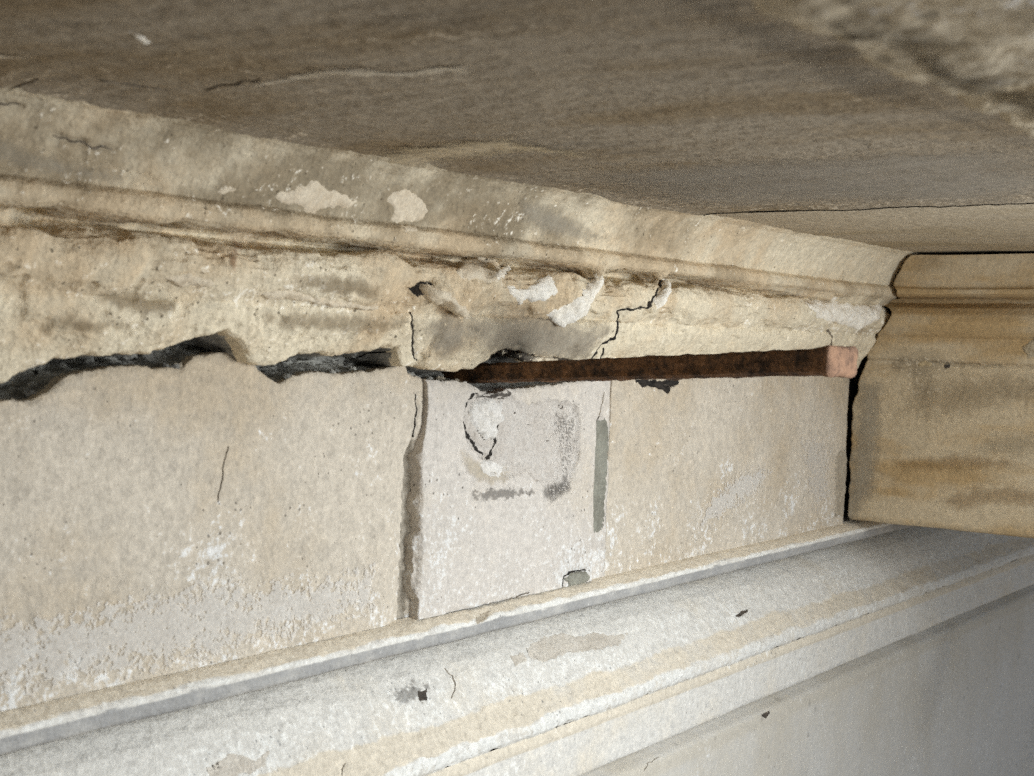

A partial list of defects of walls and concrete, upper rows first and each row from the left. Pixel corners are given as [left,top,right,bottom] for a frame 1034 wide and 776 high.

crack [0,78,38,106]
crack [206,78,261,91]
peeling [276,180,357,214]
peeling [387,189,428,232]
crack [591,279,662,359]
crack [0,312,567,437]
crack [843,297,900,521]